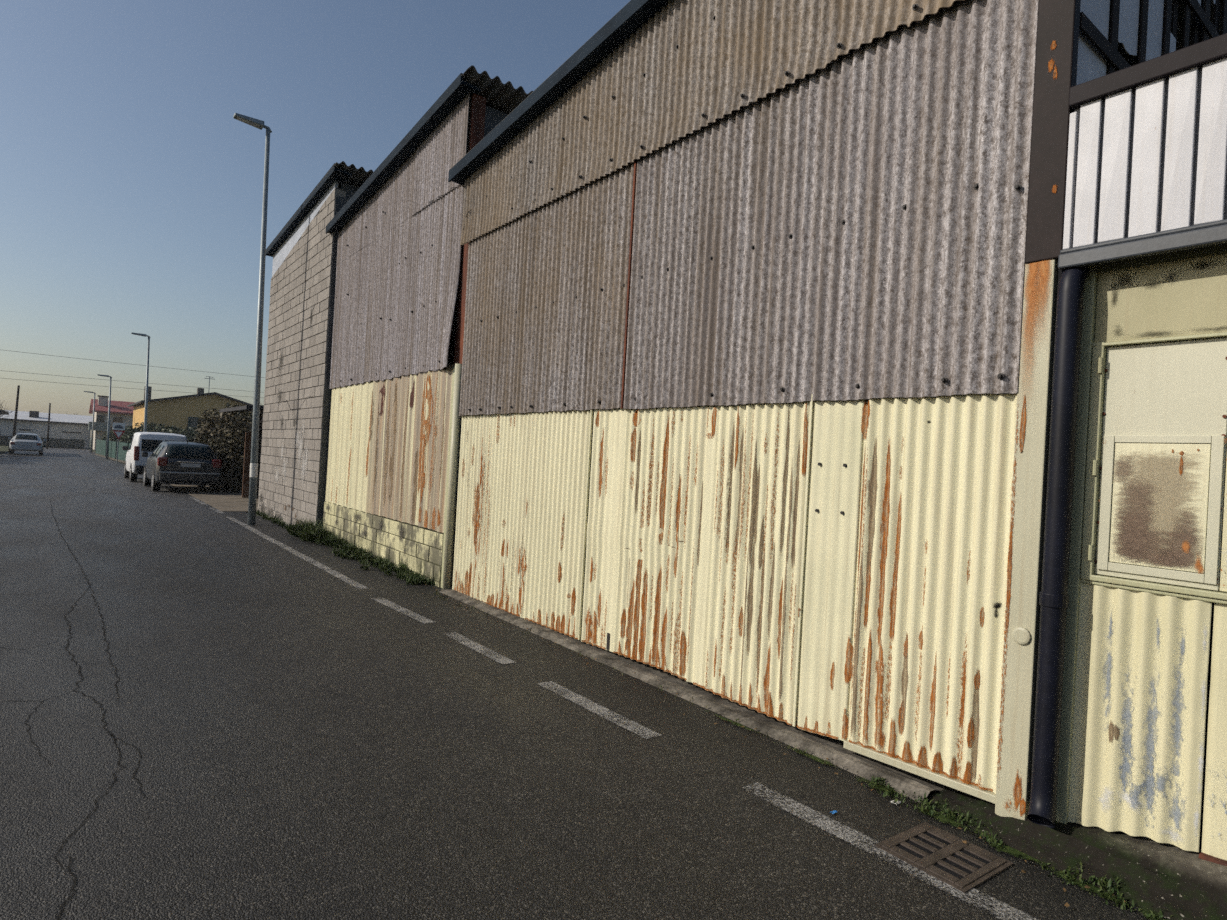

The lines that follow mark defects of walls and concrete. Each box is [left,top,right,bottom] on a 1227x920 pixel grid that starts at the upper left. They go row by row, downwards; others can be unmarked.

corrosion [1025,260,1049,342]
corrosion [366,375,445,530]
corrosion [454,397,1026,792]
crack [8,502,146,920]
corrosion [1005,770,1026,816]
peeling [1100,618,1198,839]